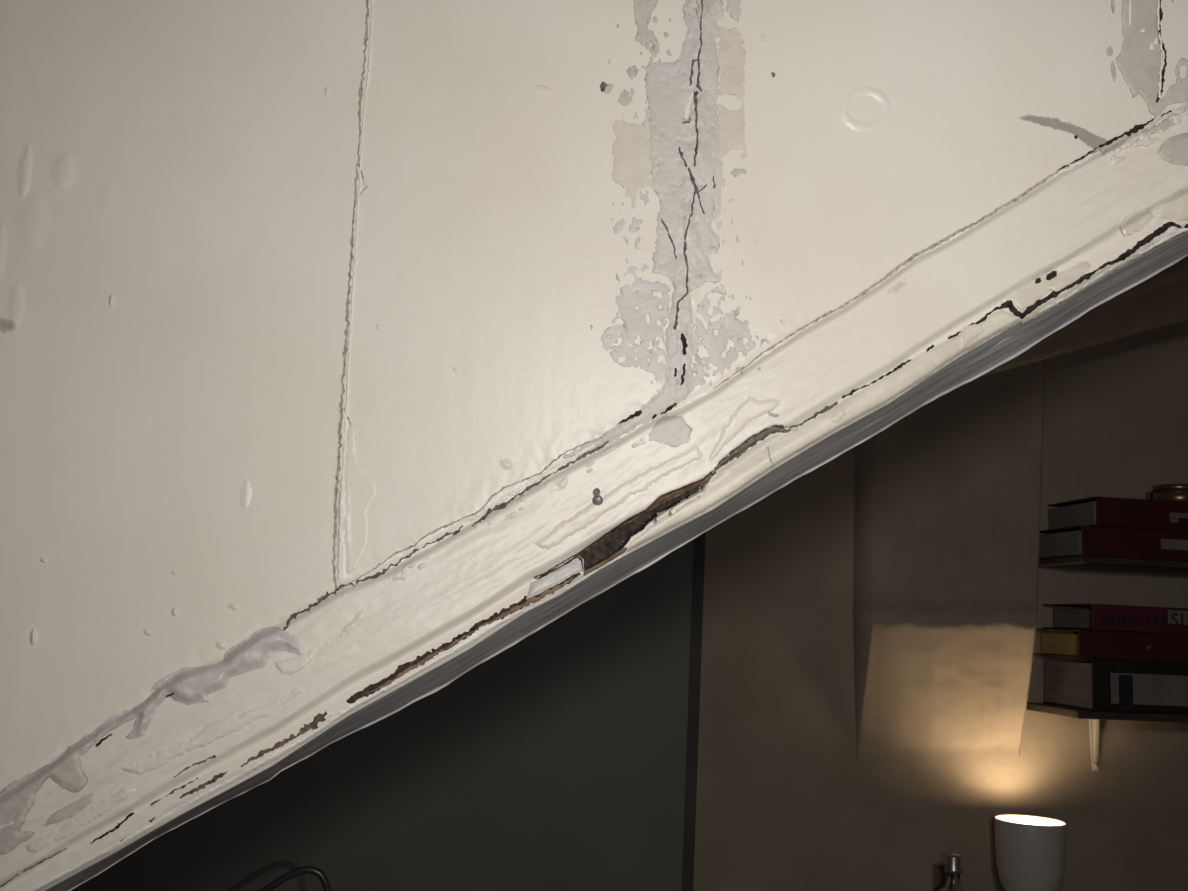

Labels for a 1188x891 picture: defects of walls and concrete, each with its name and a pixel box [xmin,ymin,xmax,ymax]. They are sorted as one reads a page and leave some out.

crack [283,0,716,631]
crack [0,222,1188,891]
peeling [600,10,671,126]
peeling [534,186,1188,552]
crack [713,0,1188,389]